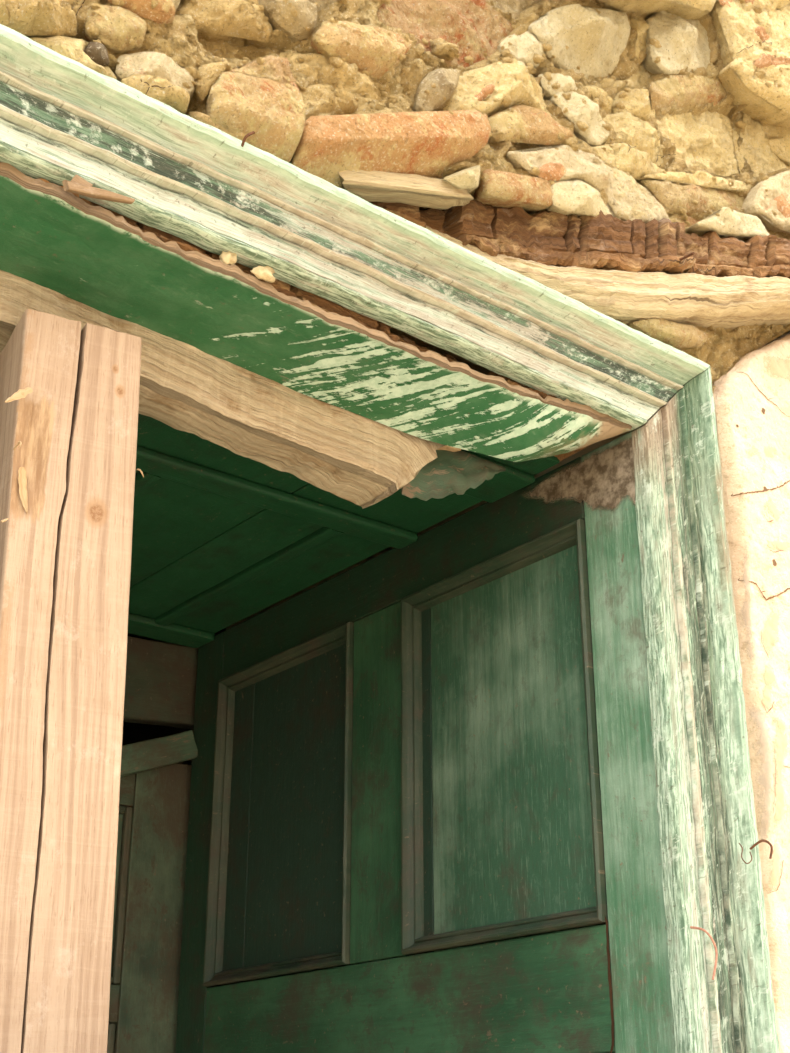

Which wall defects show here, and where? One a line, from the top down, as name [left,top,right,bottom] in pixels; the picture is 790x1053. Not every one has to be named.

crack [731,480,790,496]
crack [738,578,790,601]